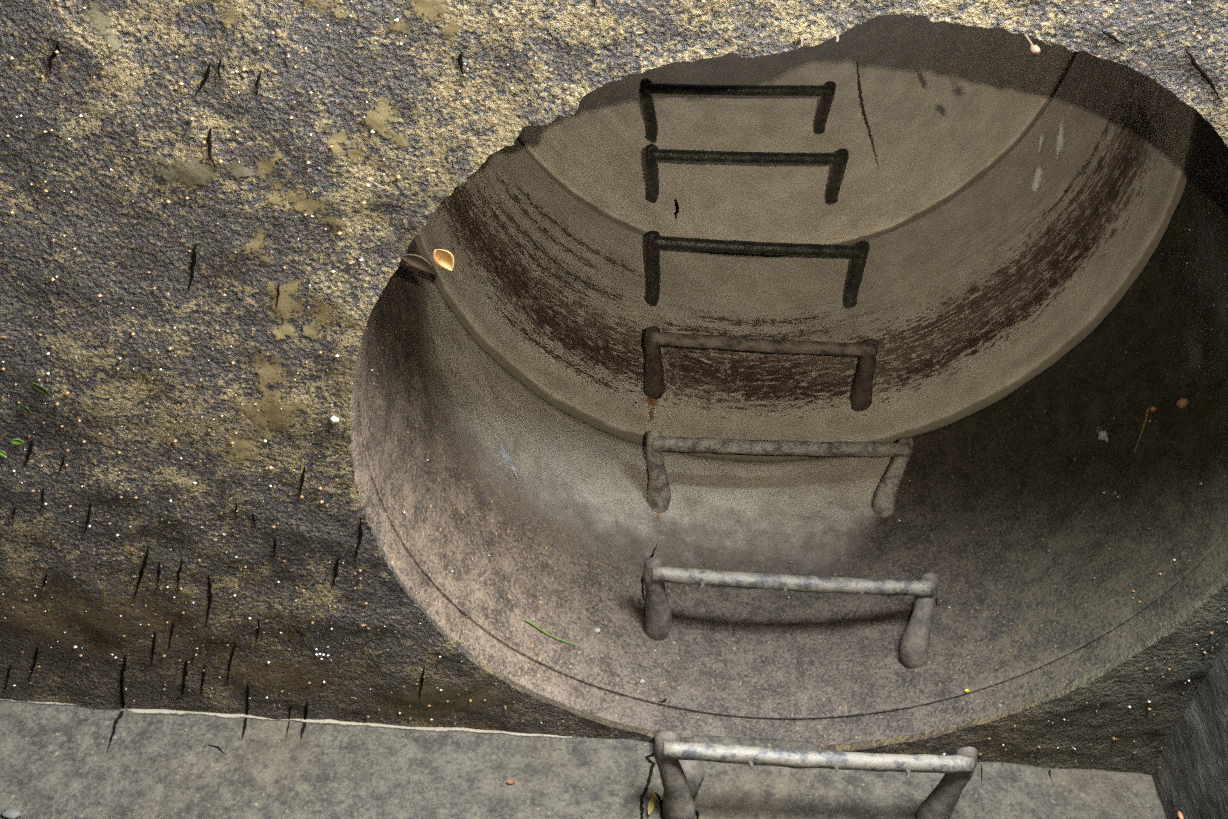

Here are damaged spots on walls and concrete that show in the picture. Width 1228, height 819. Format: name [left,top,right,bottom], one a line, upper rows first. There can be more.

crack [857,61,879,169]
crack [188,244,196,291]
crack [10,439,65,523]
crack [134,547,213,627]
crack [107,620,308,754]
crack [640,753,664,819]